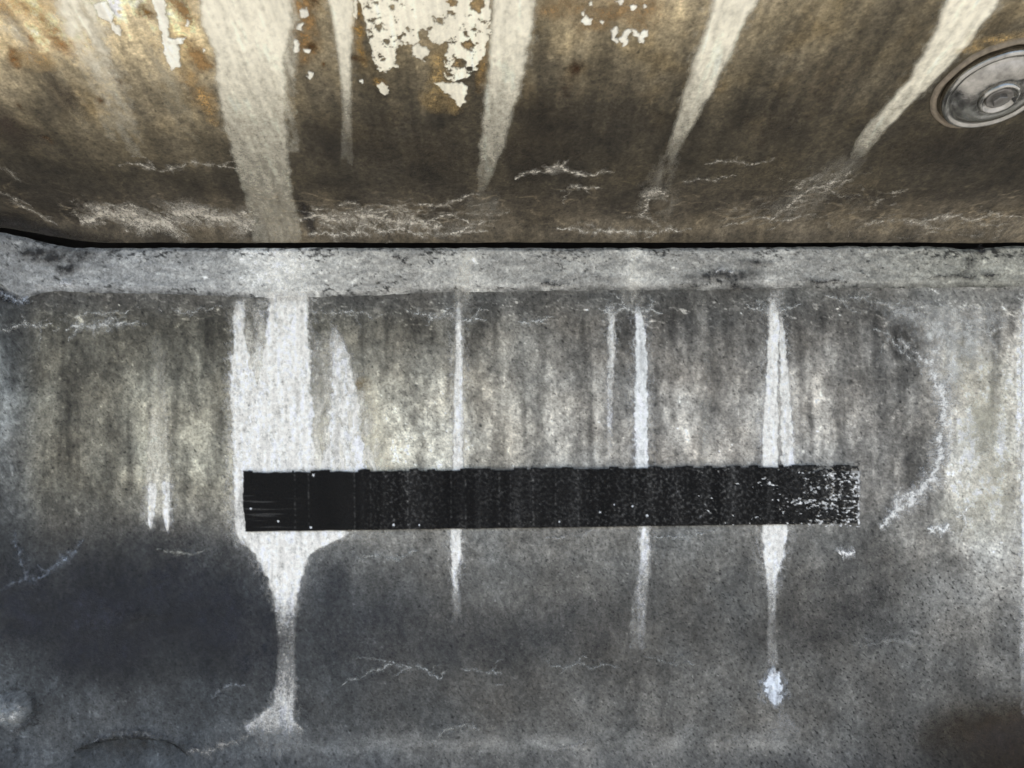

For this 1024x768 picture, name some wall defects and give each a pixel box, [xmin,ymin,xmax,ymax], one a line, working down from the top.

damp [200,0,295,159]
peeling [293,7,311,53]
peeling [352,0,493,107]
damp [486,0,535,135]
peeling [581,2,648,47]
damp [676,0,757,134]
damp [873,0,998,129]
crack [515,165,608,189]
damp [229,294,385,623]
damp [761,300,795,479]
crack [679,280,1003,528]
damp [761,522,788,594]